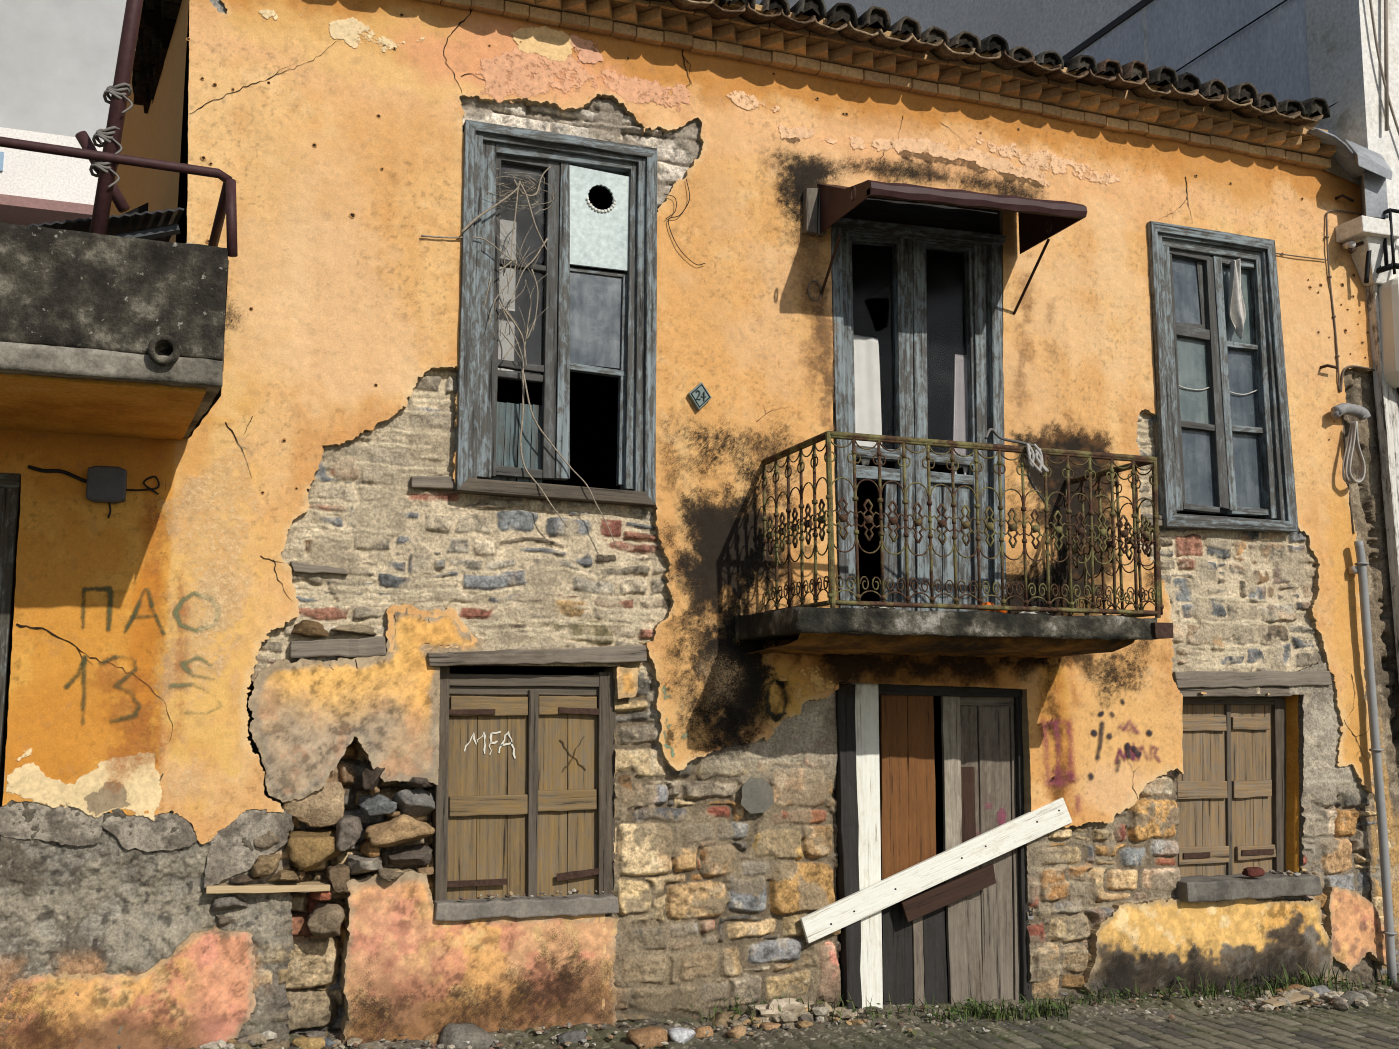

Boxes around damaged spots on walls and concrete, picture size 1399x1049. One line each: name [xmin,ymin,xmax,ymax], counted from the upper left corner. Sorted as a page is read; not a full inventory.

crack [190,38,367,114]
crack [443,9,495,99]
spalling [459,25,701,209]
water stain [770,153,1043,427]
crack [16,623,173,780]
spalling [0,368,841,1042]
water stain [656,420,813,755]
water stain [820,640,1149,706]
water stain [996,415,1121,616]
spalling [1136,274,1399,985]
spalling [1025,770,1181,1000]
water stain [1089,928,1314,998]